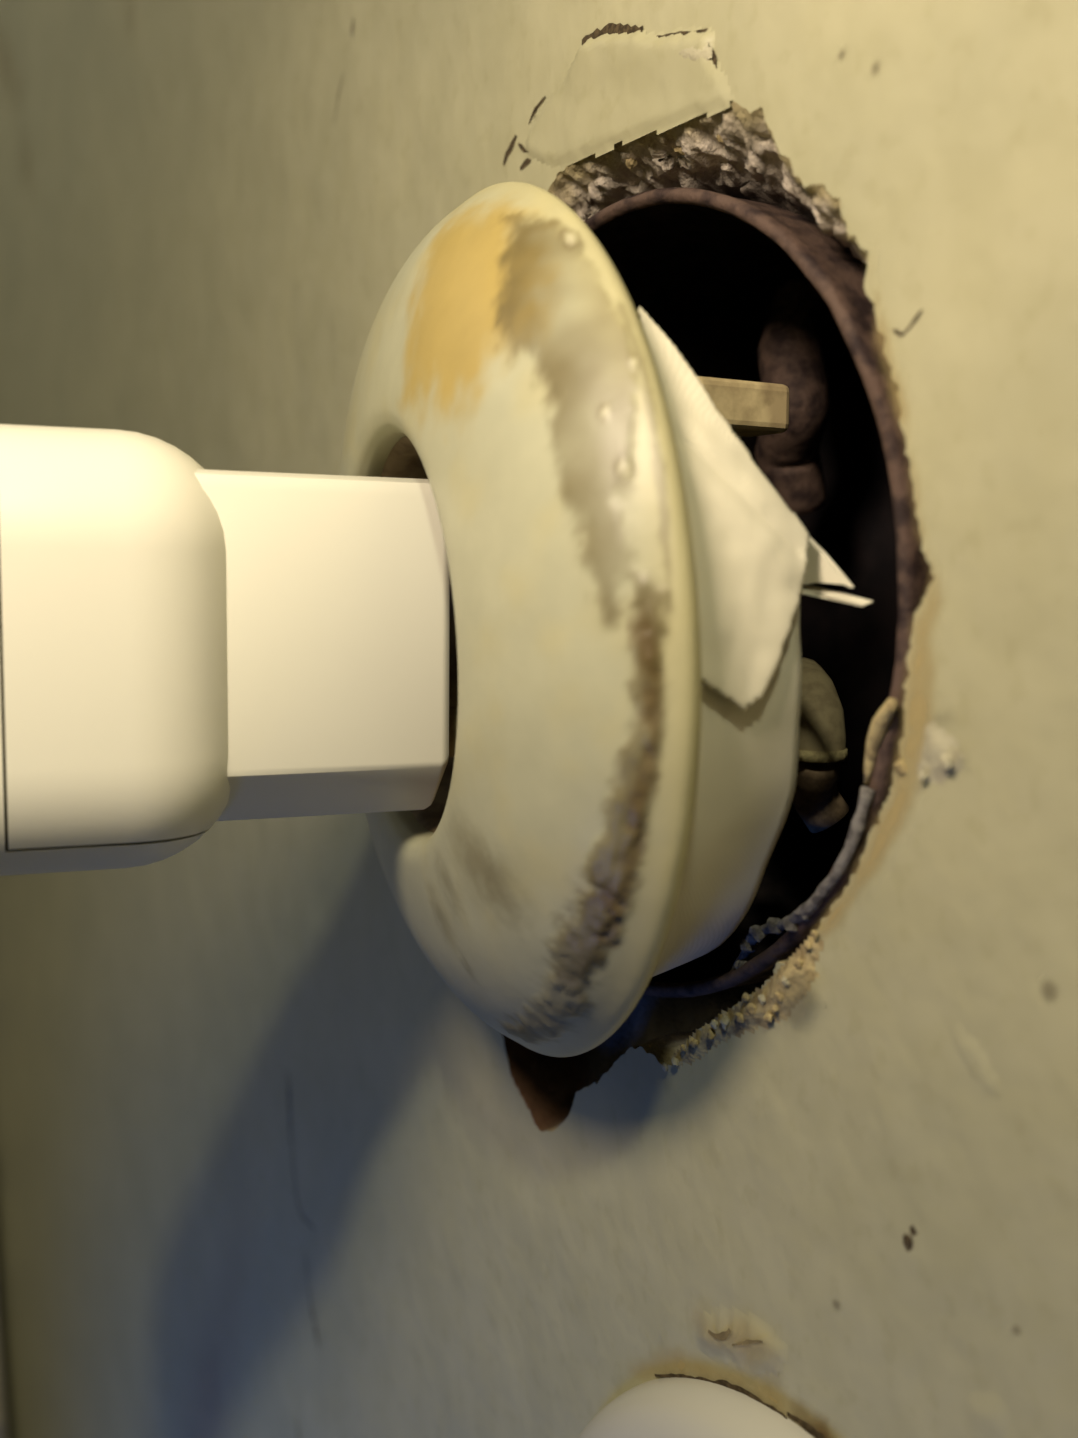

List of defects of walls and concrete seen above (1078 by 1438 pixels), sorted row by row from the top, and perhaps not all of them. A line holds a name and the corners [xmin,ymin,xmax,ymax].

peeling [526,23,868,263]
flaking render [893,721,963,784]
flaking render [502,930,824,1132]